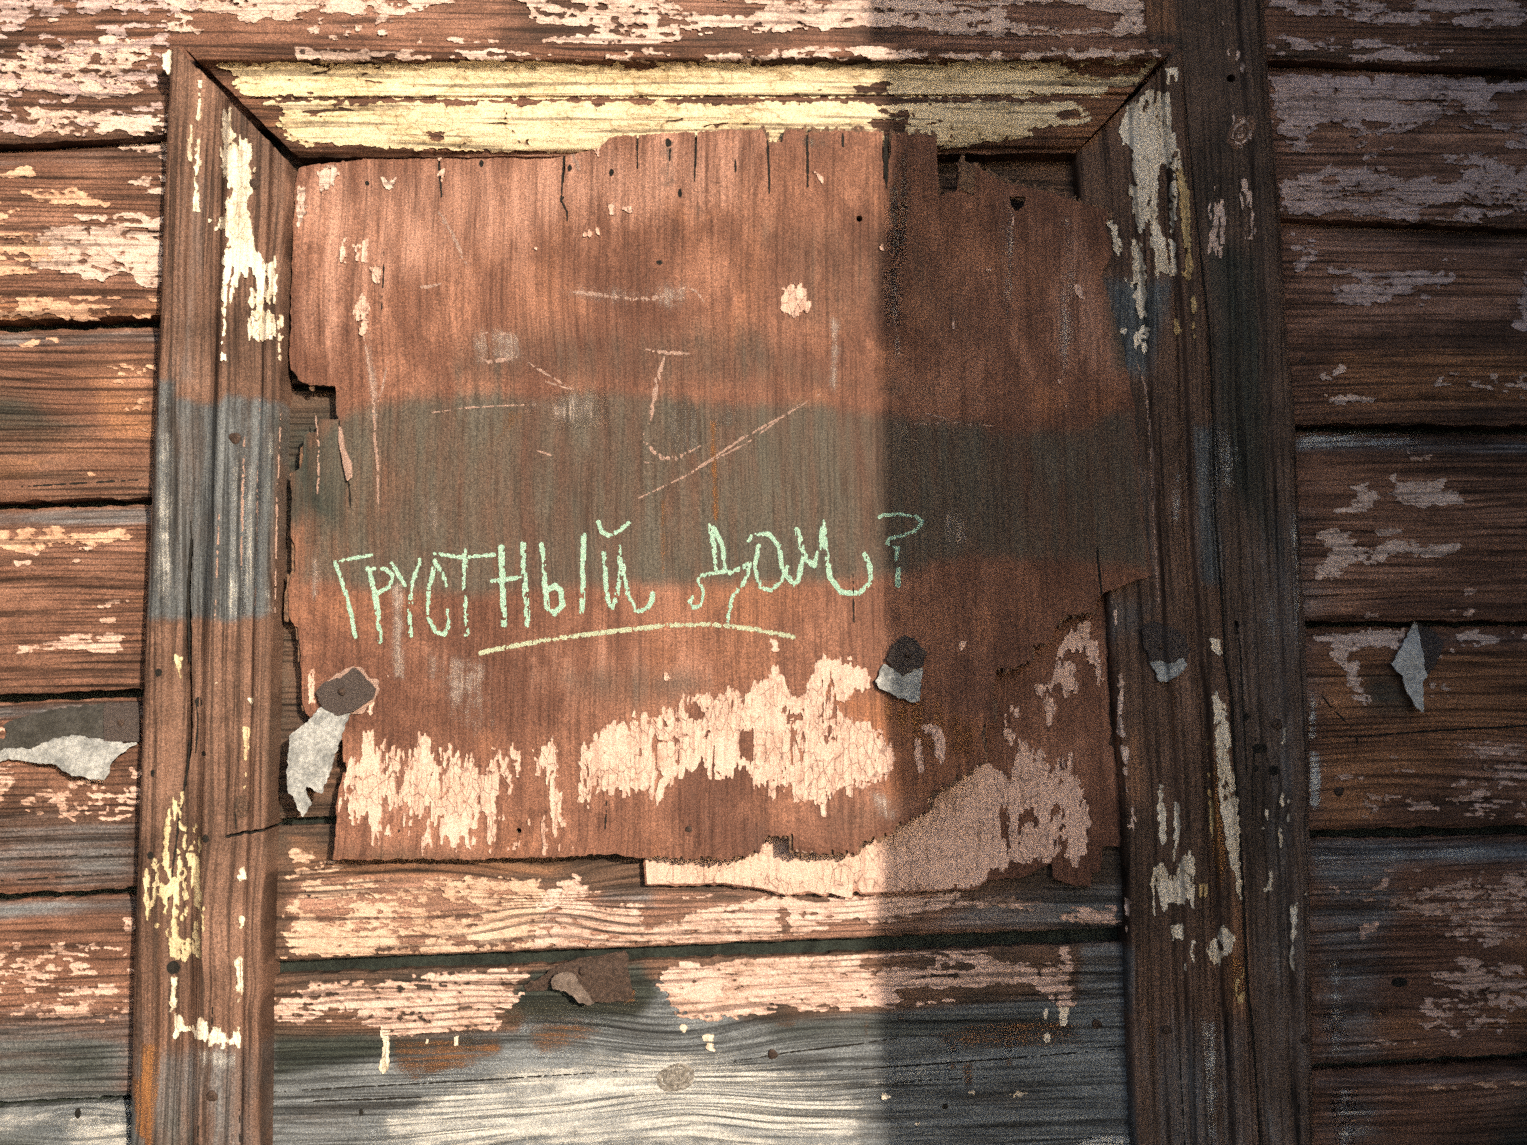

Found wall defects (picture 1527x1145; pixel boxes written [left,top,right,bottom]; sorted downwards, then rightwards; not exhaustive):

peeling [0,0,1256,361]
peeling [1267,0,1527,224]
peeling [0,525,134,567]
peeling [16,599,130,654]
peeling [0,764,142,822]
peeling [0,791,241,1049]
peeling [274,968,530,1074]
peeling [338,638,896,856]
peeling [280,705,1091,1052]
peeling [1149,784,1236,971]
peeling [1206,691,1243,900]
peeling [1328,869,1527,1047]